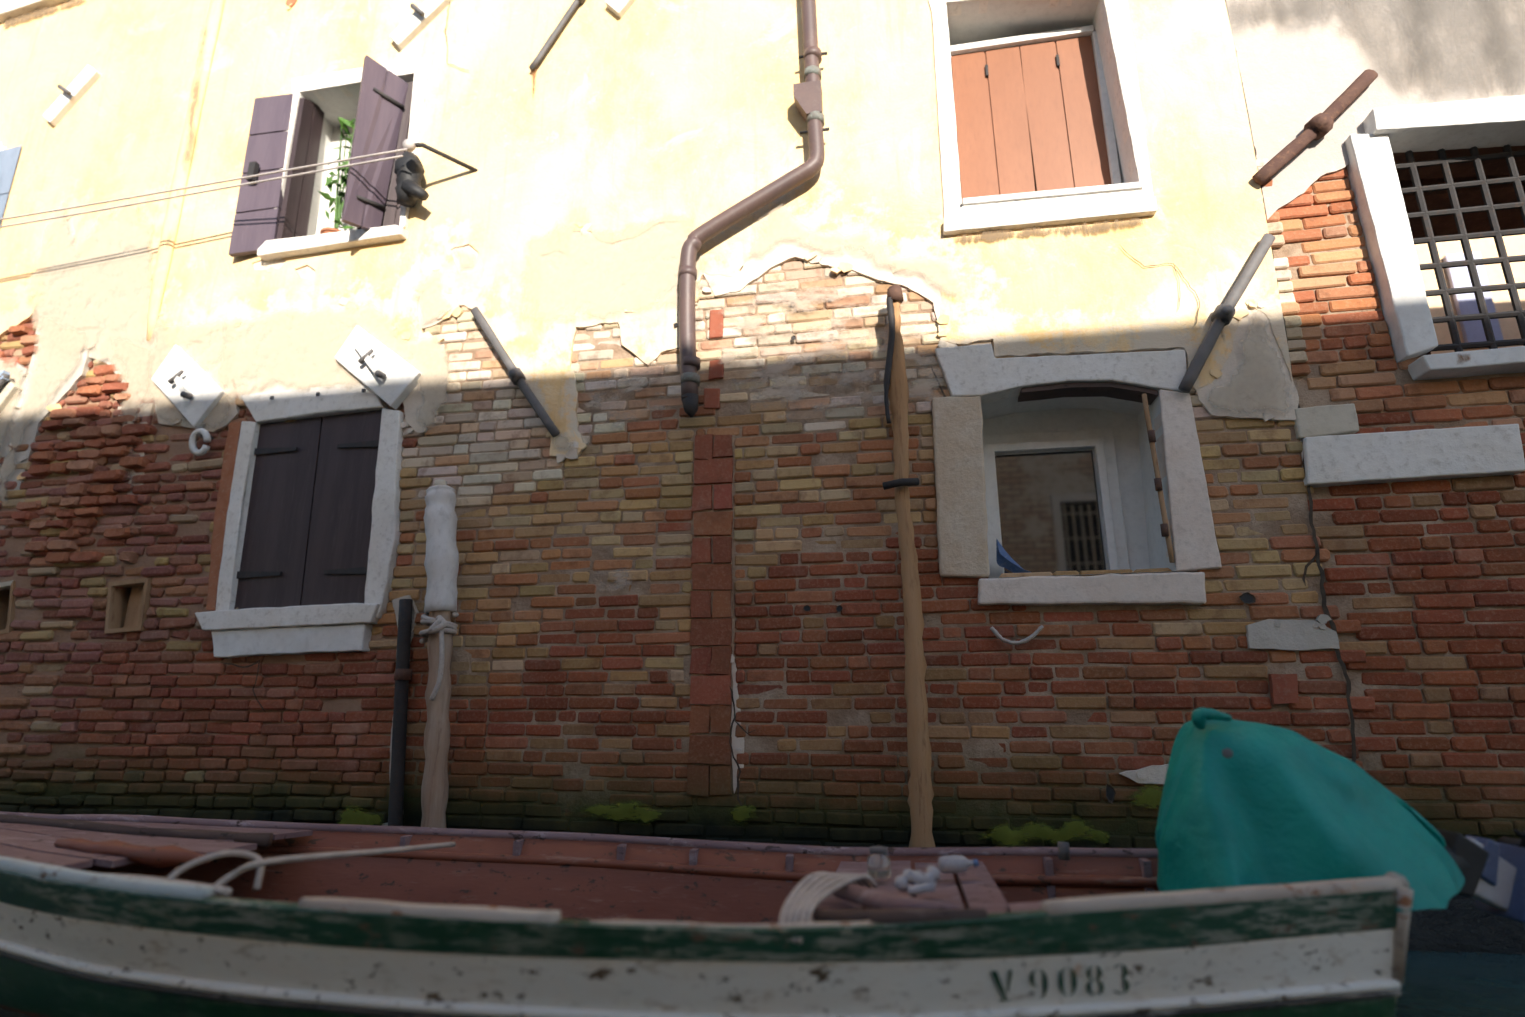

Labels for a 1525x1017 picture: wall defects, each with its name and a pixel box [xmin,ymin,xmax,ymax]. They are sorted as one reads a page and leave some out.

peeling [524,206,961,348]
crack [1119,244,1200,327]
peeling [0,204,463,501]
peeling [1195,299,1299,422]
peeling [546,430,587,463]
crack [729,686,755,806]